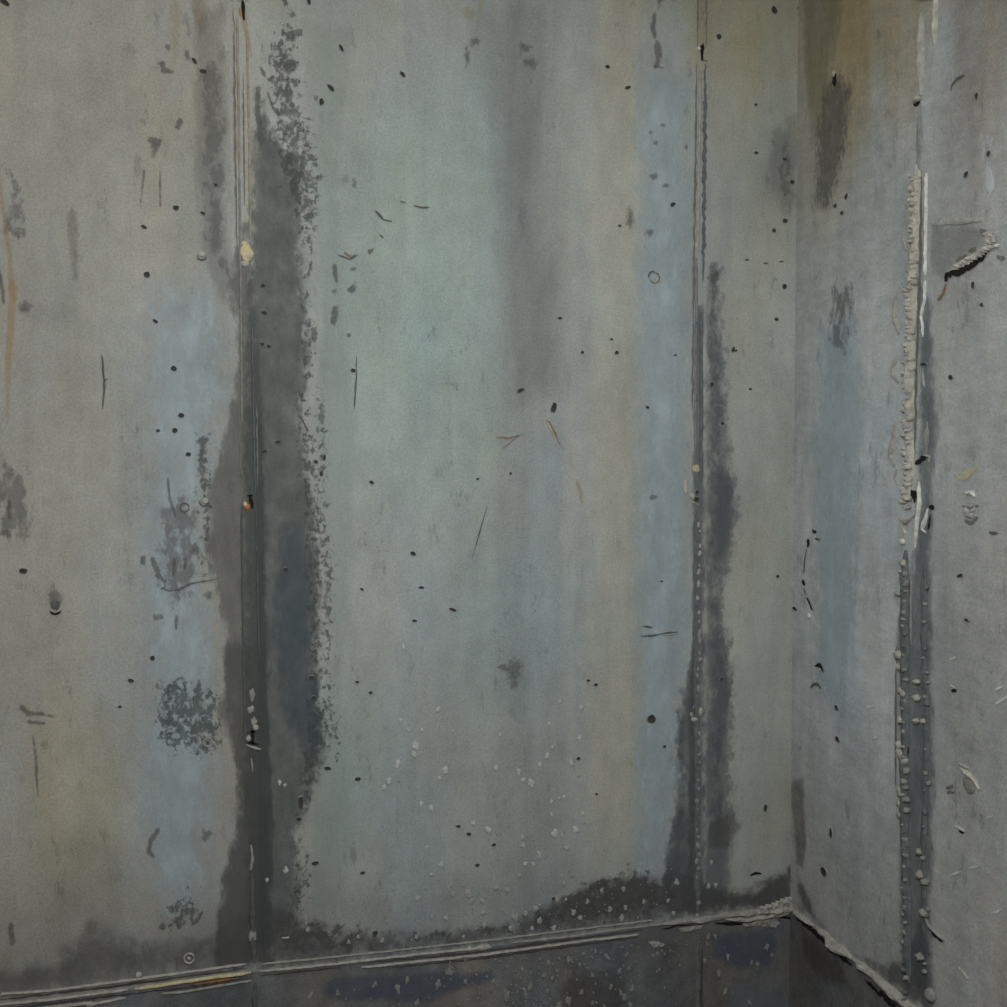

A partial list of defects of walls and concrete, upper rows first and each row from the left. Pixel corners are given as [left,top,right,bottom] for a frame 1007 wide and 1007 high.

water stain [141,293,264,895]
water stain [216,756,262,955]
water stain [255,85,811,964]
spalling [931,217,1005,301]